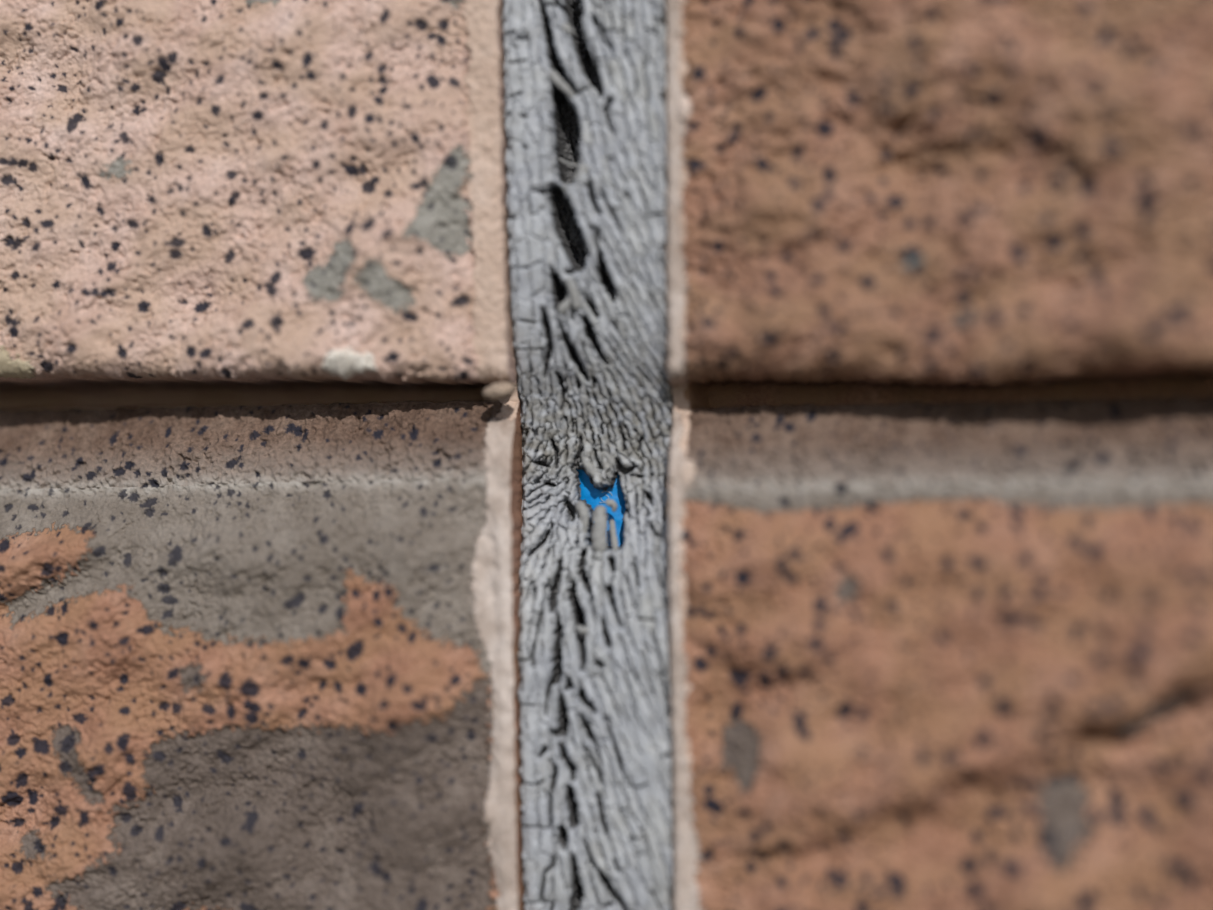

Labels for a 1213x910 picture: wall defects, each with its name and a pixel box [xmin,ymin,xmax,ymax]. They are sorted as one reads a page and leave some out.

crack [534,0,618,411]
crack [528,529,628,910]